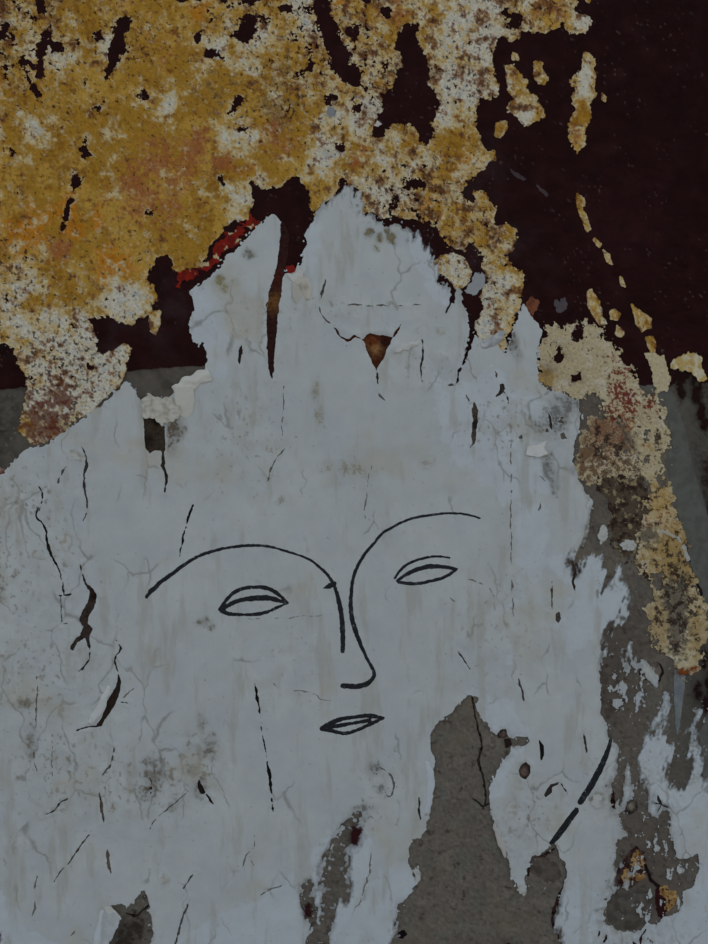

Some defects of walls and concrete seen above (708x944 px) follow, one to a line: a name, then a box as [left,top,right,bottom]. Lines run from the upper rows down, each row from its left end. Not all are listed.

rust [525,296,540,317]
rust [669,368,708,430]
crack [35,448,88,624]
crack [145,777,214,829]
peeling [425,761,435,816]
peeling [493,824,507,858]
crack [126,904,149,918]
crack [174,874,193,944]
peeling [615,846,678,919]